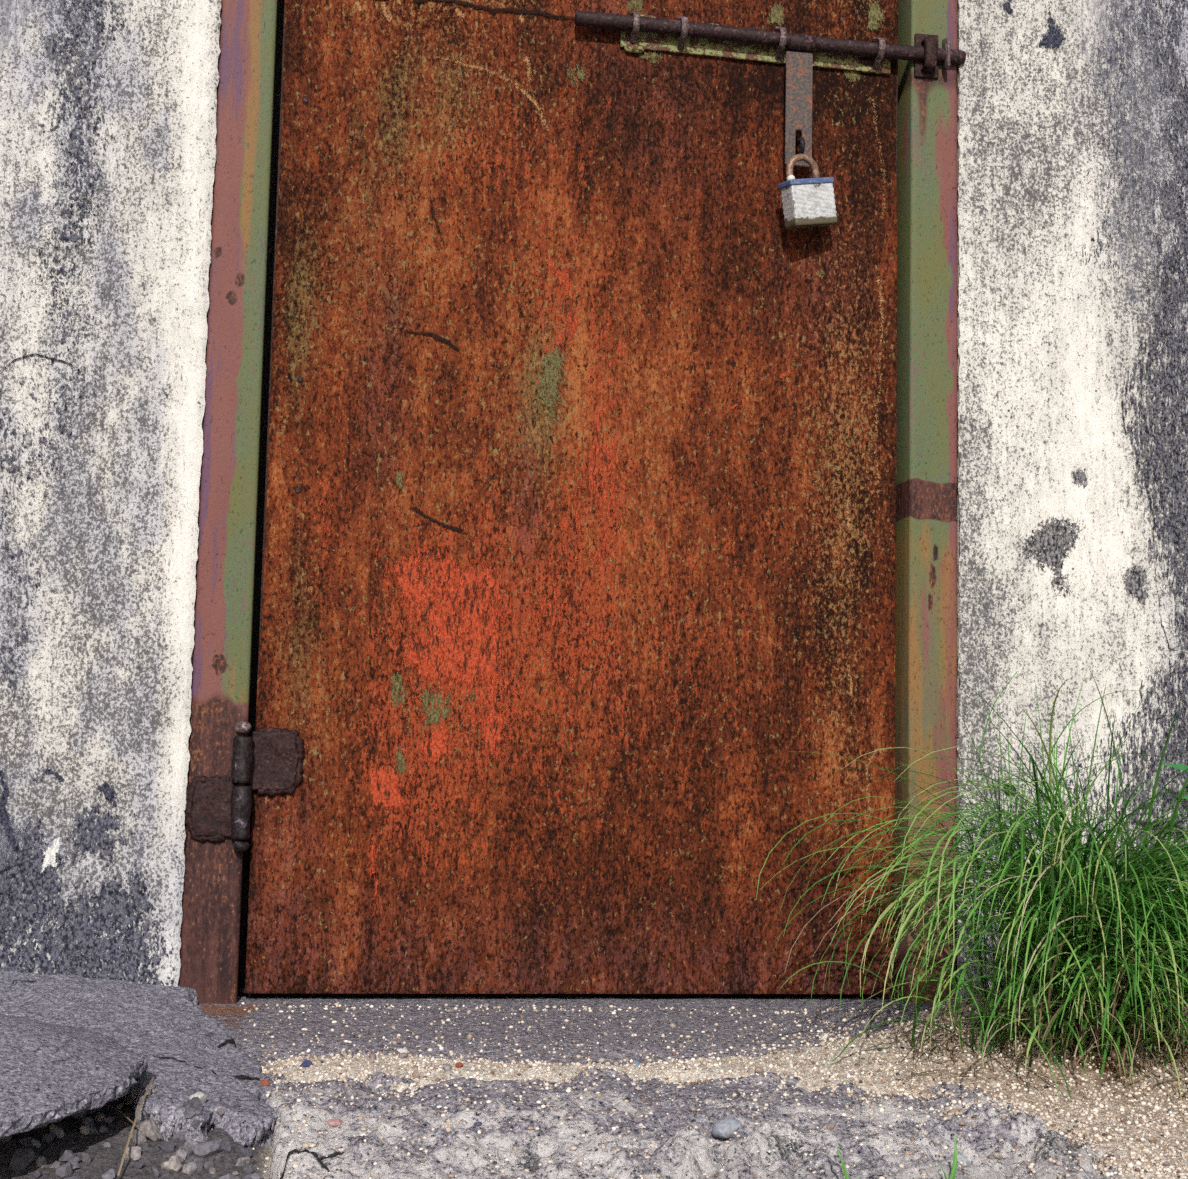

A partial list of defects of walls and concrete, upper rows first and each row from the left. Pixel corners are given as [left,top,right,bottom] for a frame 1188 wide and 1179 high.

water stain [0,0,128,702]
water stain [1078,0,1159,298]